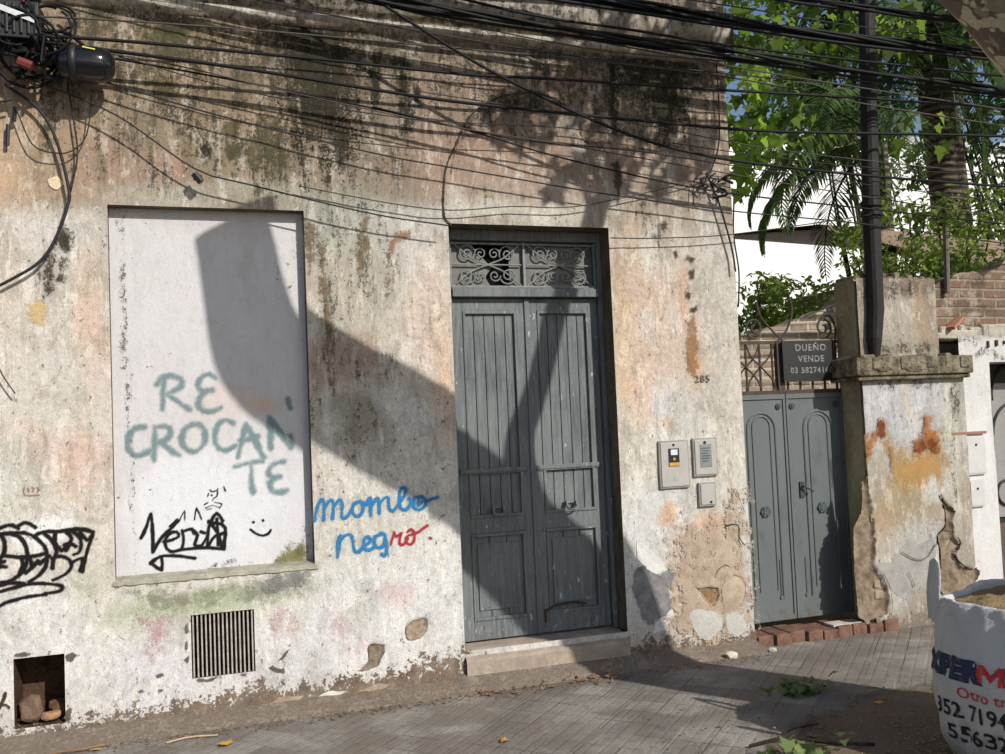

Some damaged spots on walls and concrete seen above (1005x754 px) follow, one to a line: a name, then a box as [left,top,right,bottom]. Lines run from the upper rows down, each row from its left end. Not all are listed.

mould [136,13,219,123]
damp [200,24,421,196]
damp [606,56,712,160]
damp [611,160,623,211]
rust [685,269,700,379]
rust [864,411,949,493]
peeling [628,478,761,654]
spalling [853,476,890,624]
spalling [937,494,980,594]
spalling [406,617,428,640]
spalling [0,643,487,738]